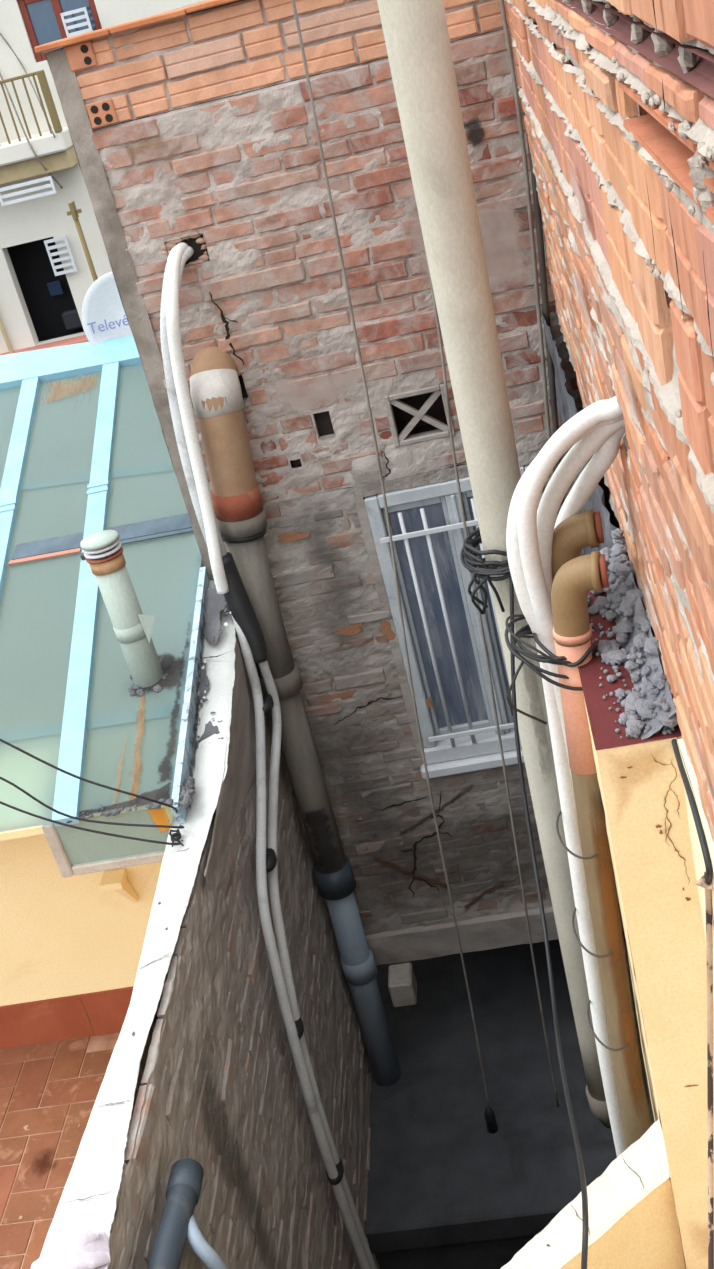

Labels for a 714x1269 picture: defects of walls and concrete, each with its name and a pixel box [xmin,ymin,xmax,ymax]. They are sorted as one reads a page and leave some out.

crack [209,292,244,365]
rust [116,696,145,800]
crack [370,793,453,898]
crack [652,756,690,885]